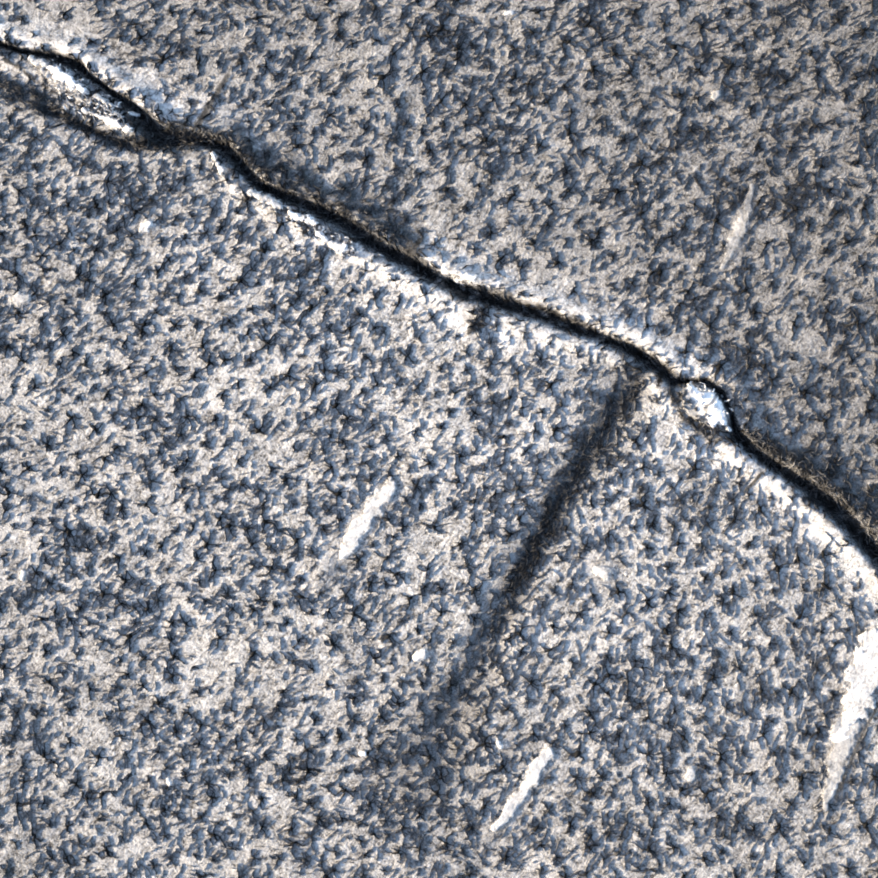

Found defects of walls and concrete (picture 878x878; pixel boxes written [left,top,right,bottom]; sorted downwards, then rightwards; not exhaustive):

crack [0,20,878,599]